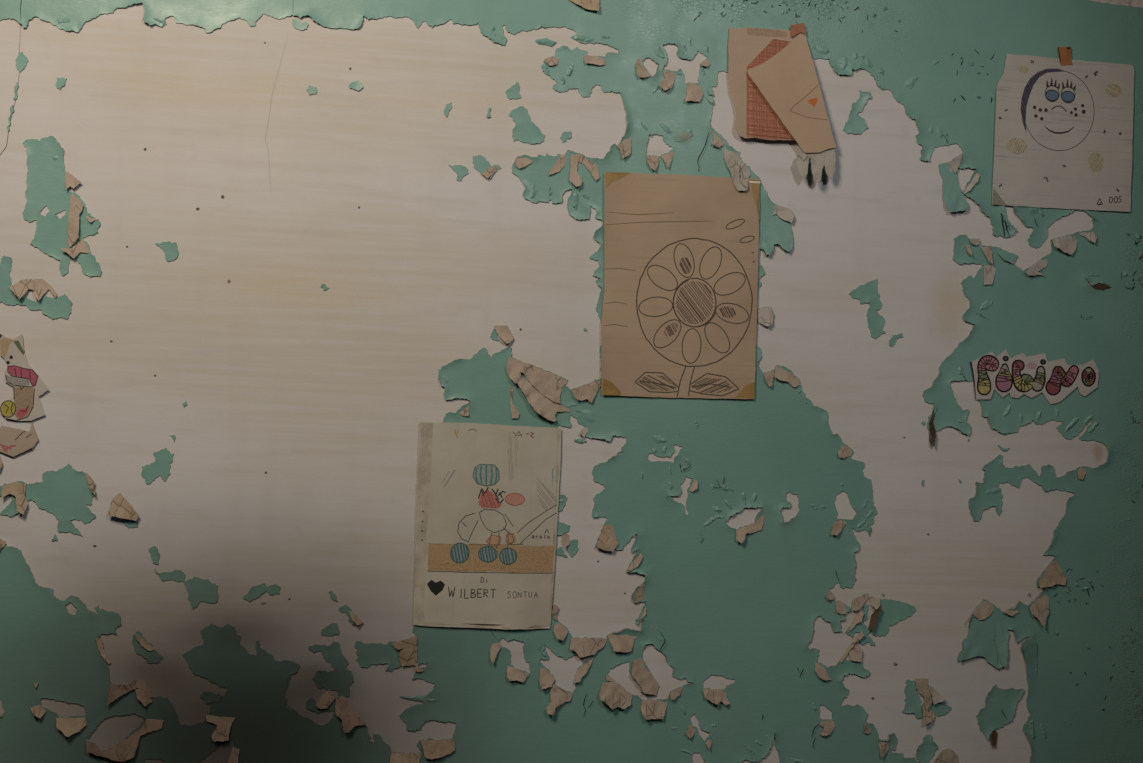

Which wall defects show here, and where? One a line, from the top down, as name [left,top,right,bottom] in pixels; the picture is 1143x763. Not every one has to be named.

peeling [0,3,735,763]
peeling [636,36,1112,763]